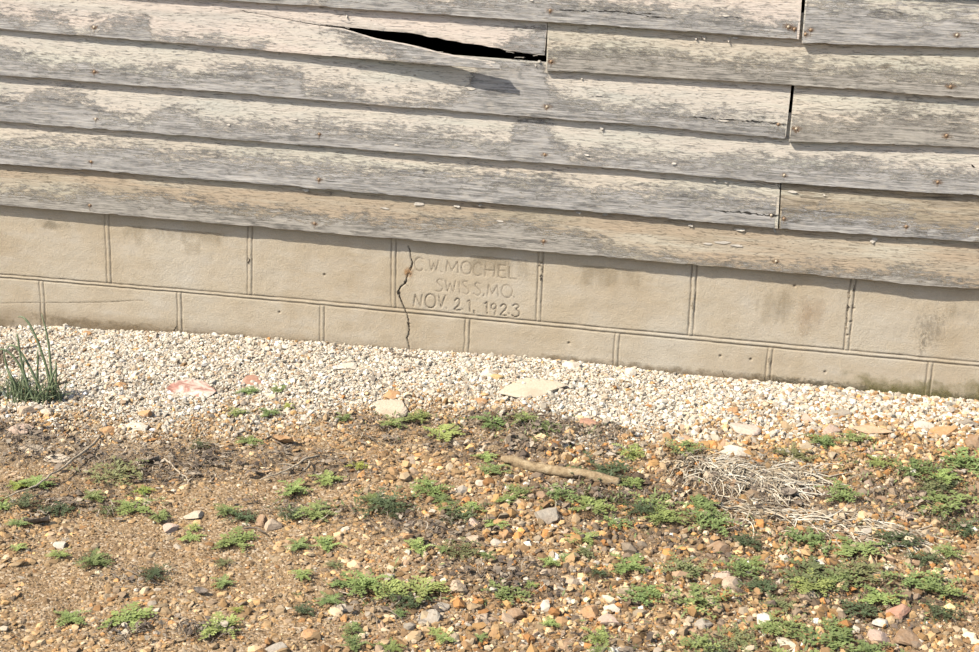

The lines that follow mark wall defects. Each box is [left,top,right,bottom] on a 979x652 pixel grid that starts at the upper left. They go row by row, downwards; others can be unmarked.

crack [242,10,350,30]
crack [397,249,413,341]